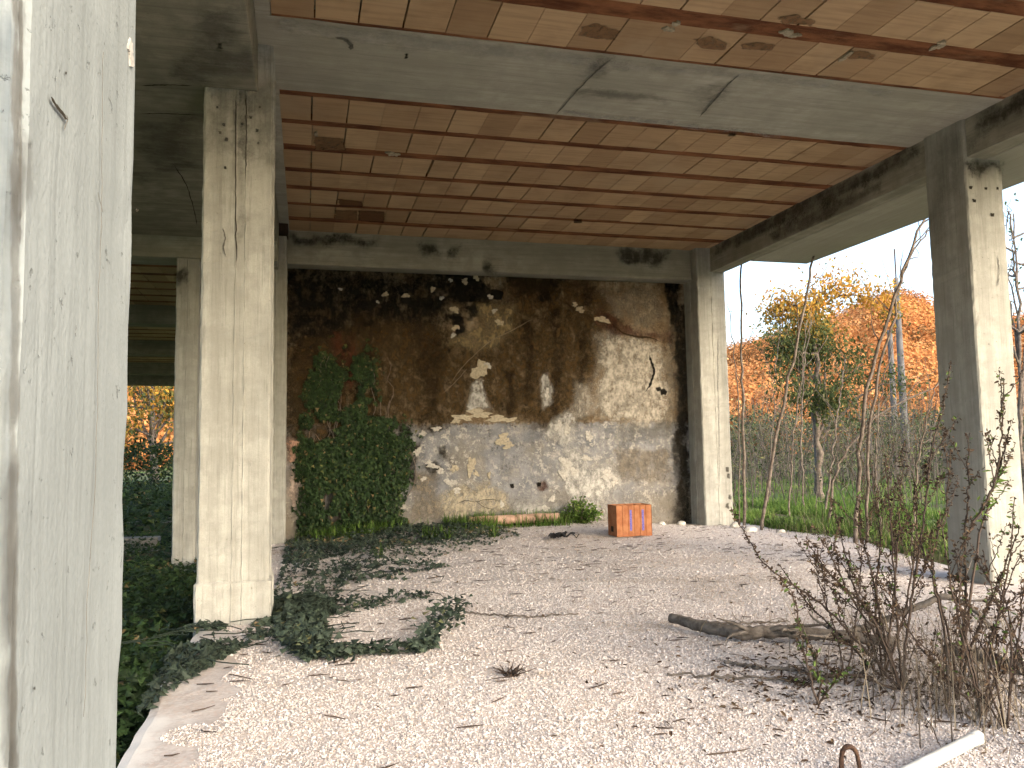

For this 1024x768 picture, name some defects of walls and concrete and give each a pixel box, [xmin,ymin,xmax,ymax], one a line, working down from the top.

spalling [579,23,620,40]
spalling [695,37,727,50]
spalling [741,15,815,50]
leakage [978,92,1024,127]
crack [223,92,247,266]
leakage [716,149,913,254]
leakage [620,247,664,265]
leakage [286,264,560,429]
crack [645,356,655,392]
leakage [412,283,691,523]
flaking render [400,408,517,494]
peeling [558,455,593,481]